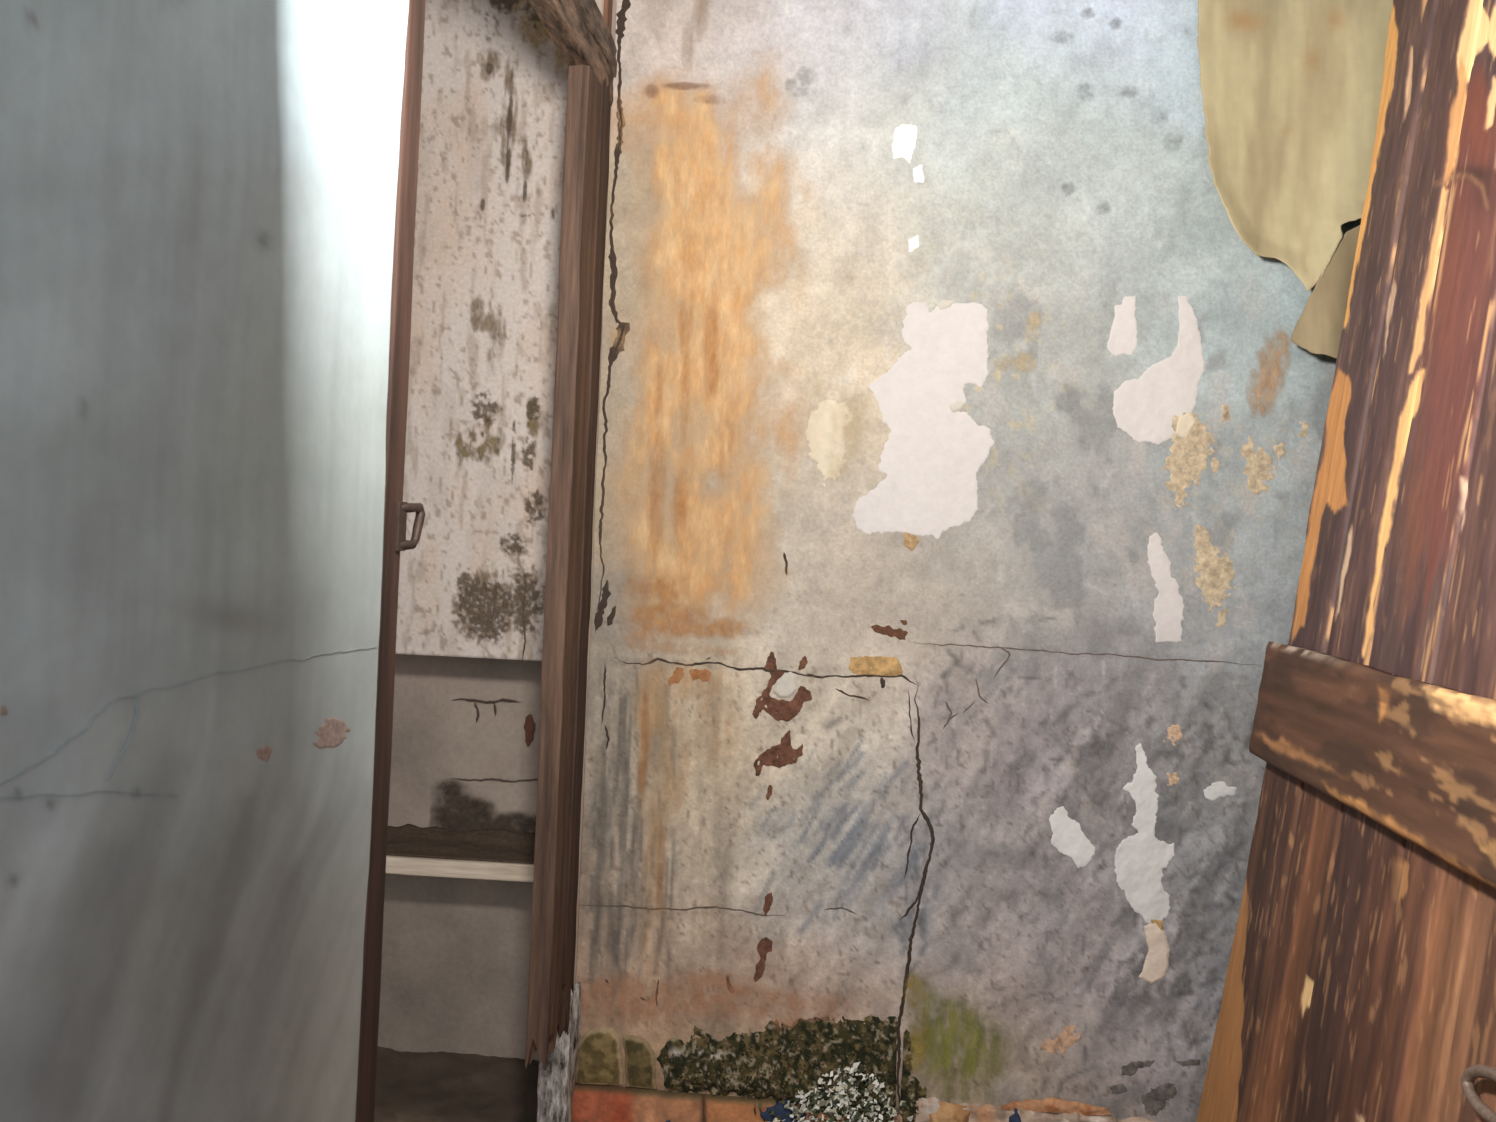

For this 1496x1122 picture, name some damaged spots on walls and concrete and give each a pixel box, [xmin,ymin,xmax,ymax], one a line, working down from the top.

water stain [490,0,563,63]
water stain [482,38,531,200]
peeling [892,124,924,183]
water stain [472,299,499,338]
peeling [1107,295,1137,356]
water stain [455,393,539,474]
peeling [853,300,995,551]
peeling [1112,296,1238,642]
water stain [452,491,545,644]
crack [587,0,1255,1107]
peeling [1049,806,1095,868]
peeling [1114,743,1179,984]